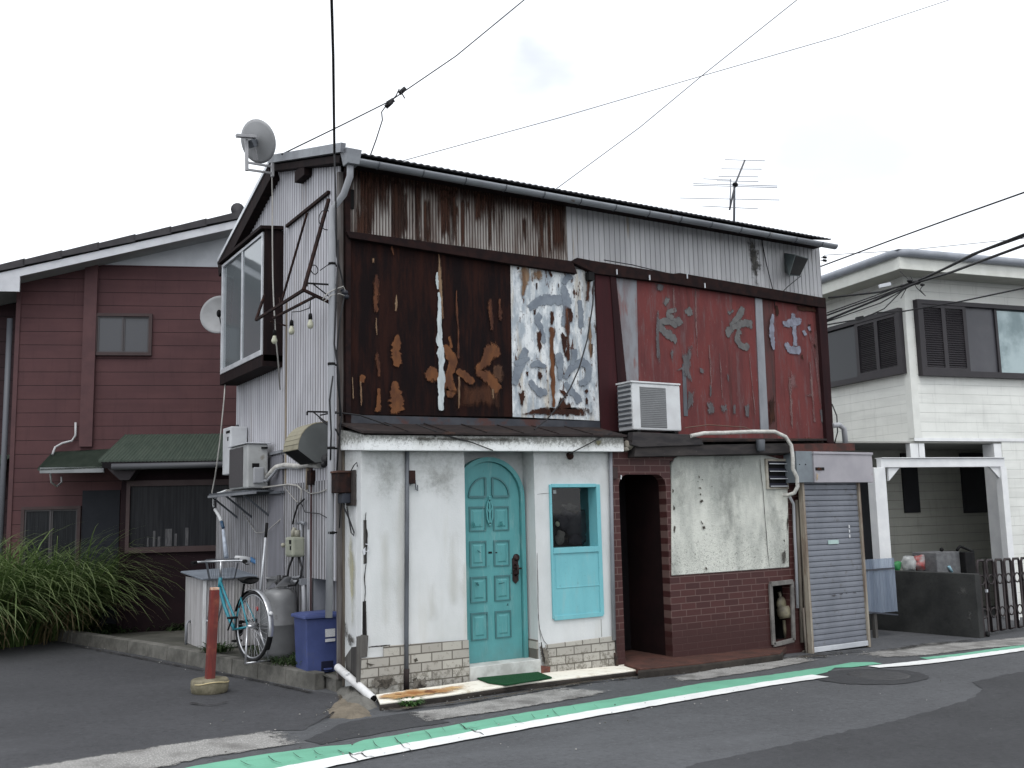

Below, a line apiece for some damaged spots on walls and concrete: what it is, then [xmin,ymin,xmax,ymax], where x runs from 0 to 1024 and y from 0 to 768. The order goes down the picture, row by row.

corrosion [353,170,565,257]
corrosion [517,267,559,296]
peeling [464,365,503,406]
corrosion [519,306,592,417]